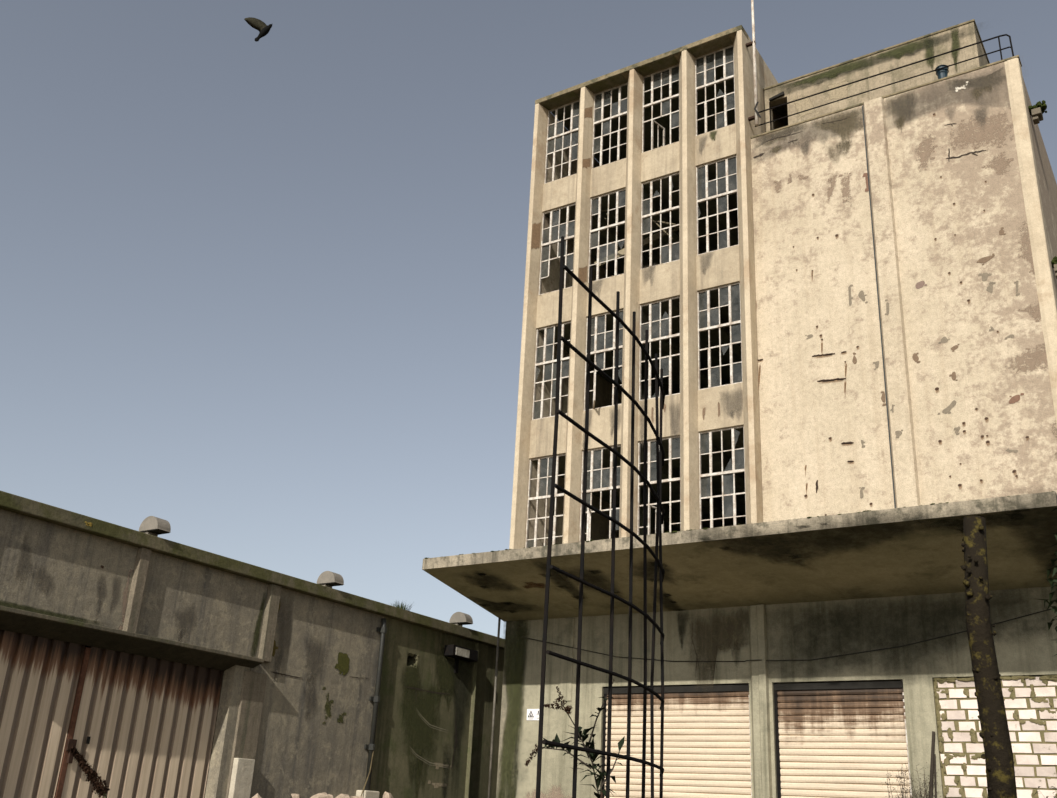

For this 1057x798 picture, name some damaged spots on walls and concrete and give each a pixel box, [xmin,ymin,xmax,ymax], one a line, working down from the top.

water stain [788,30,1000,99]
water stain [820,111,861,157]
water stain [891,95,914,129]
spalling [977,253,996,293]
peeling [1020,224,1035,274]
peeling [1019,305,1041,322]
spalling [812,346,859,364]
peeling [1005,344,1048,373]
water stain [702,516,963,564]
water stain [976,500,1057,568]
water stain [658,593,747,680]
water stain [403,656,468,798]